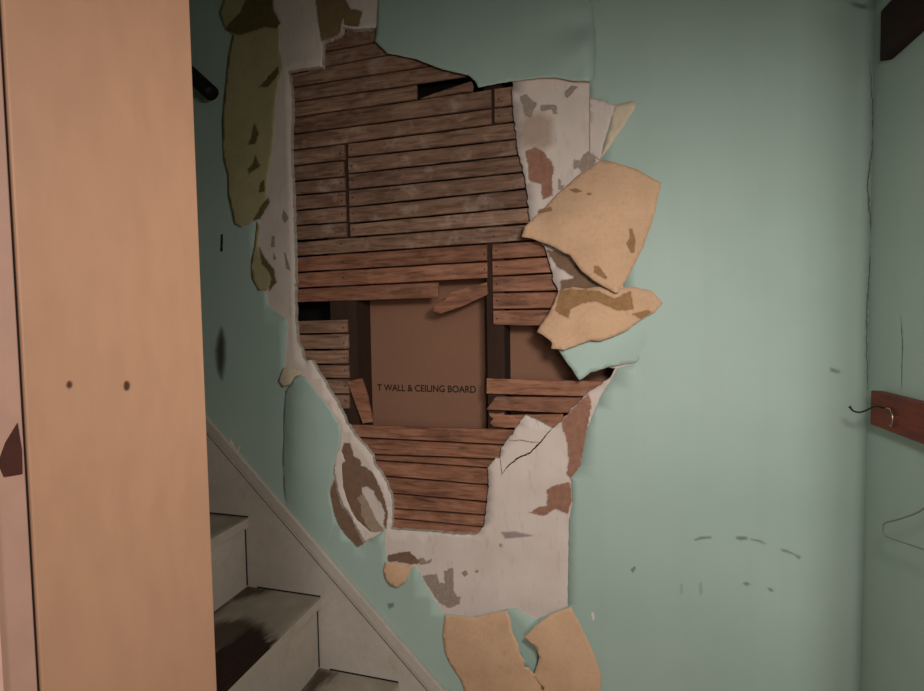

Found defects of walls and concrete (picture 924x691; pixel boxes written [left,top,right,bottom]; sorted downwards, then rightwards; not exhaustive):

flaking render [219,0,634,691]
crack [500,416,552,476]
peeling [512,78,662,350]